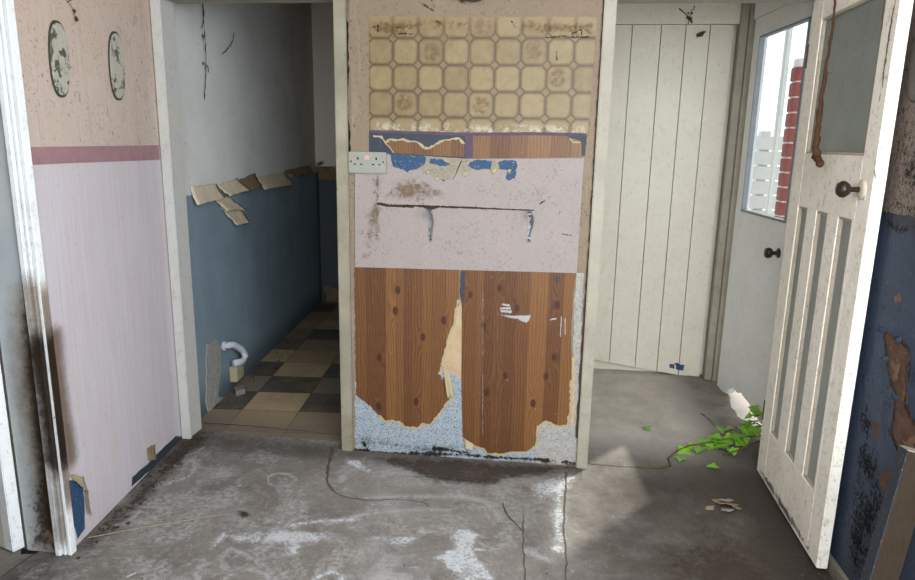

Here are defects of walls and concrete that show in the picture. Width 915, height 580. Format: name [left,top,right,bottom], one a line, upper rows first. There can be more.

peeling [390,154,517,181]
flaking render [354,273,584,464]
peeling [871,326,915,450]
crack [205,423,430,506]
leakage [213,442,576,580]
crack [502,503,526,580]
crack [561,472,569,580]
mould [849,405,882,572]